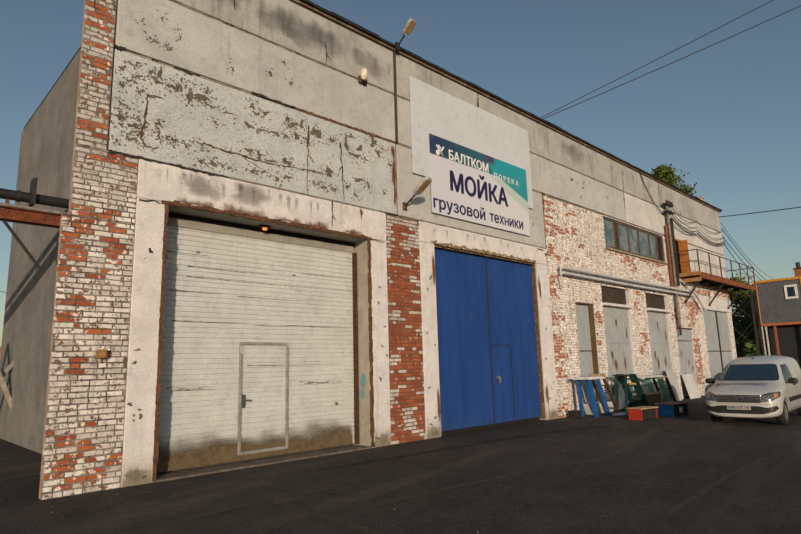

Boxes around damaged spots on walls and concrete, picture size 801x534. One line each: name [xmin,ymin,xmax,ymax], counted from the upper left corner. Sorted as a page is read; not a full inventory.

crack [136,94,151,146]
flaking render [76,0,394,201]
crack [203,125,344,226]
flaking render [57,204,128,279]
flaking render [543,200,585,261]
flaking render [65,358,88,374]
flaking render [53,295,110,334]
flaking render [378,224,437,443]
flaking render [545,275,569,418]
flaking render [672,283,729,327]
flaking render [43,421,122,492]
water stain [156,425,352,473]